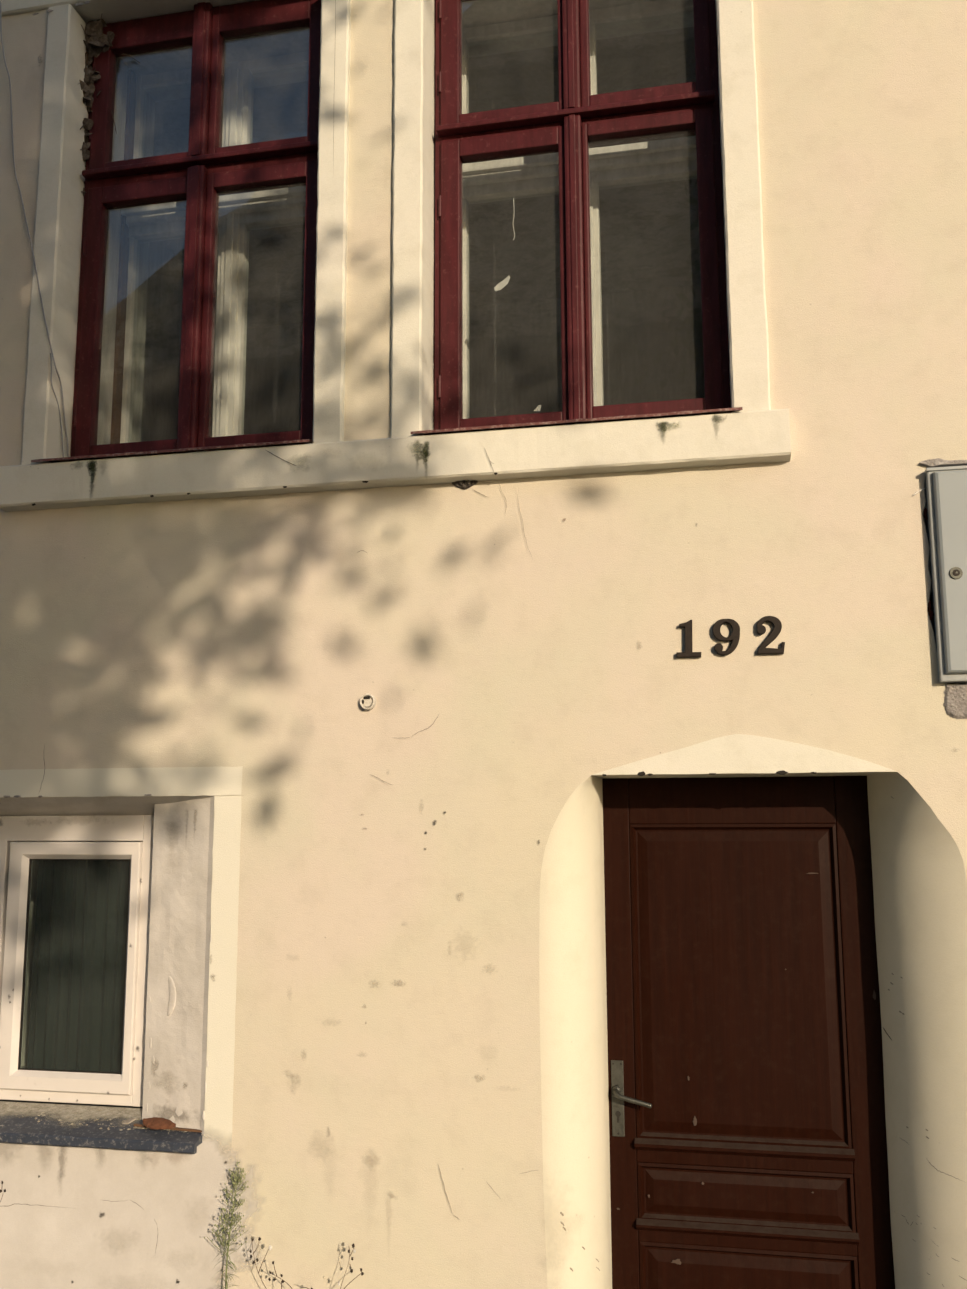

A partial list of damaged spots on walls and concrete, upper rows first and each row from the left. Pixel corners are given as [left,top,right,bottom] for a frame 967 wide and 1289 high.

peeling [919,458,967,650]